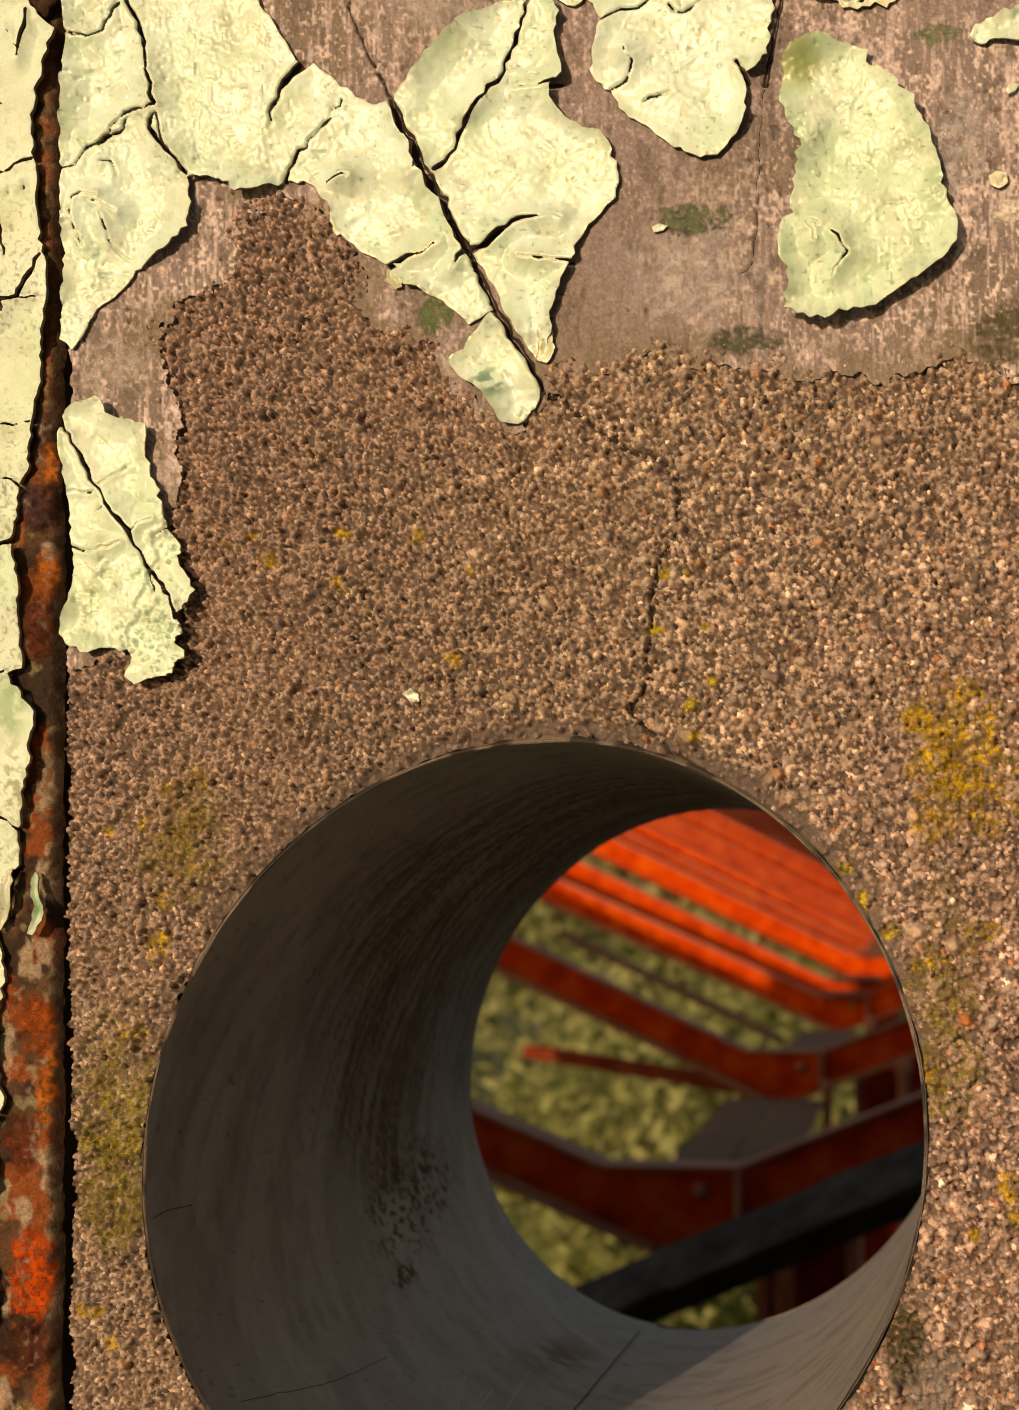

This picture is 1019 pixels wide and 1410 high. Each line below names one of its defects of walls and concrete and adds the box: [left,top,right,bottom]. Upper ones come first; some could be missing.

peeling [57,0,541,424]
peeling [394,0,619,363]
peeling [588,0,775,158]
crack [738,0,783,274]
peeling [778,31,958,318]
peeling [0,0,57,935]
corrosion [21,550,61,660]
corrosion [39,444,59,509]
peeling [57,395,195,685]
crack [347,0,690,761]
corrosion [3,997,59,1168]
corrosion [3,1229,54,1375]